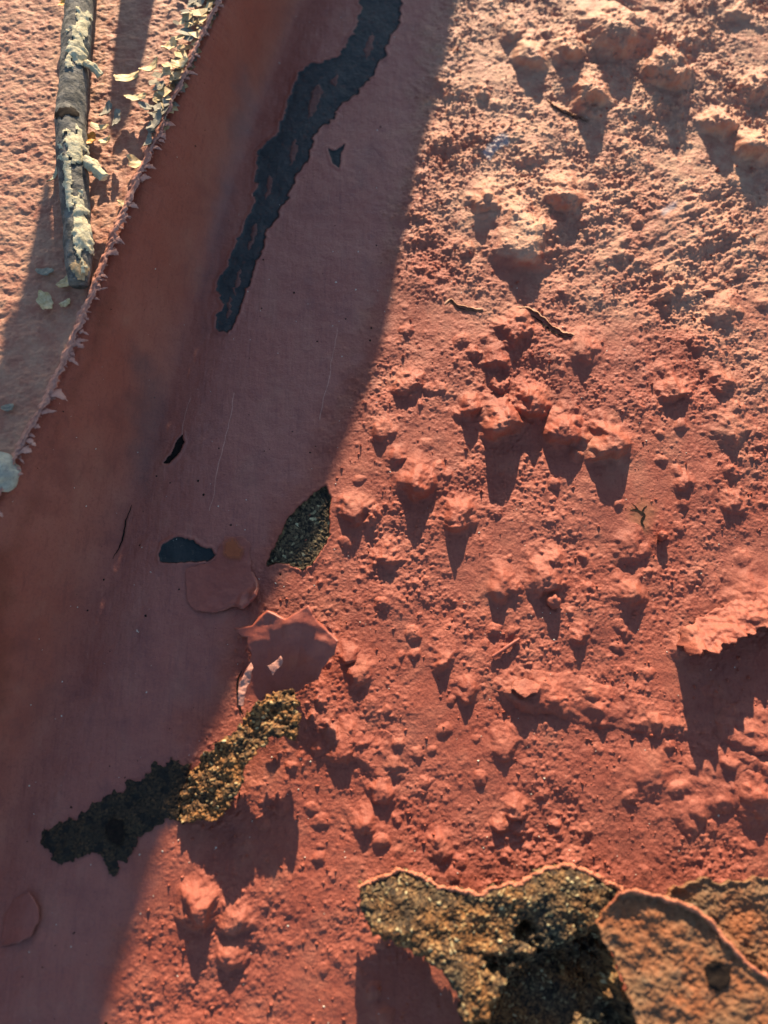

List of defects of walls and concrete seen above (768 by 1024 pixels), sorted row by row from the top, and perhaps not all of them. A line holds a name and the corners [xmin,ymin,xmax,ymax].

peeling [216,0,403,332]
peeling [164,435,184,464]
peeling [159,537,215,563]
spalling [40,605,339,877]